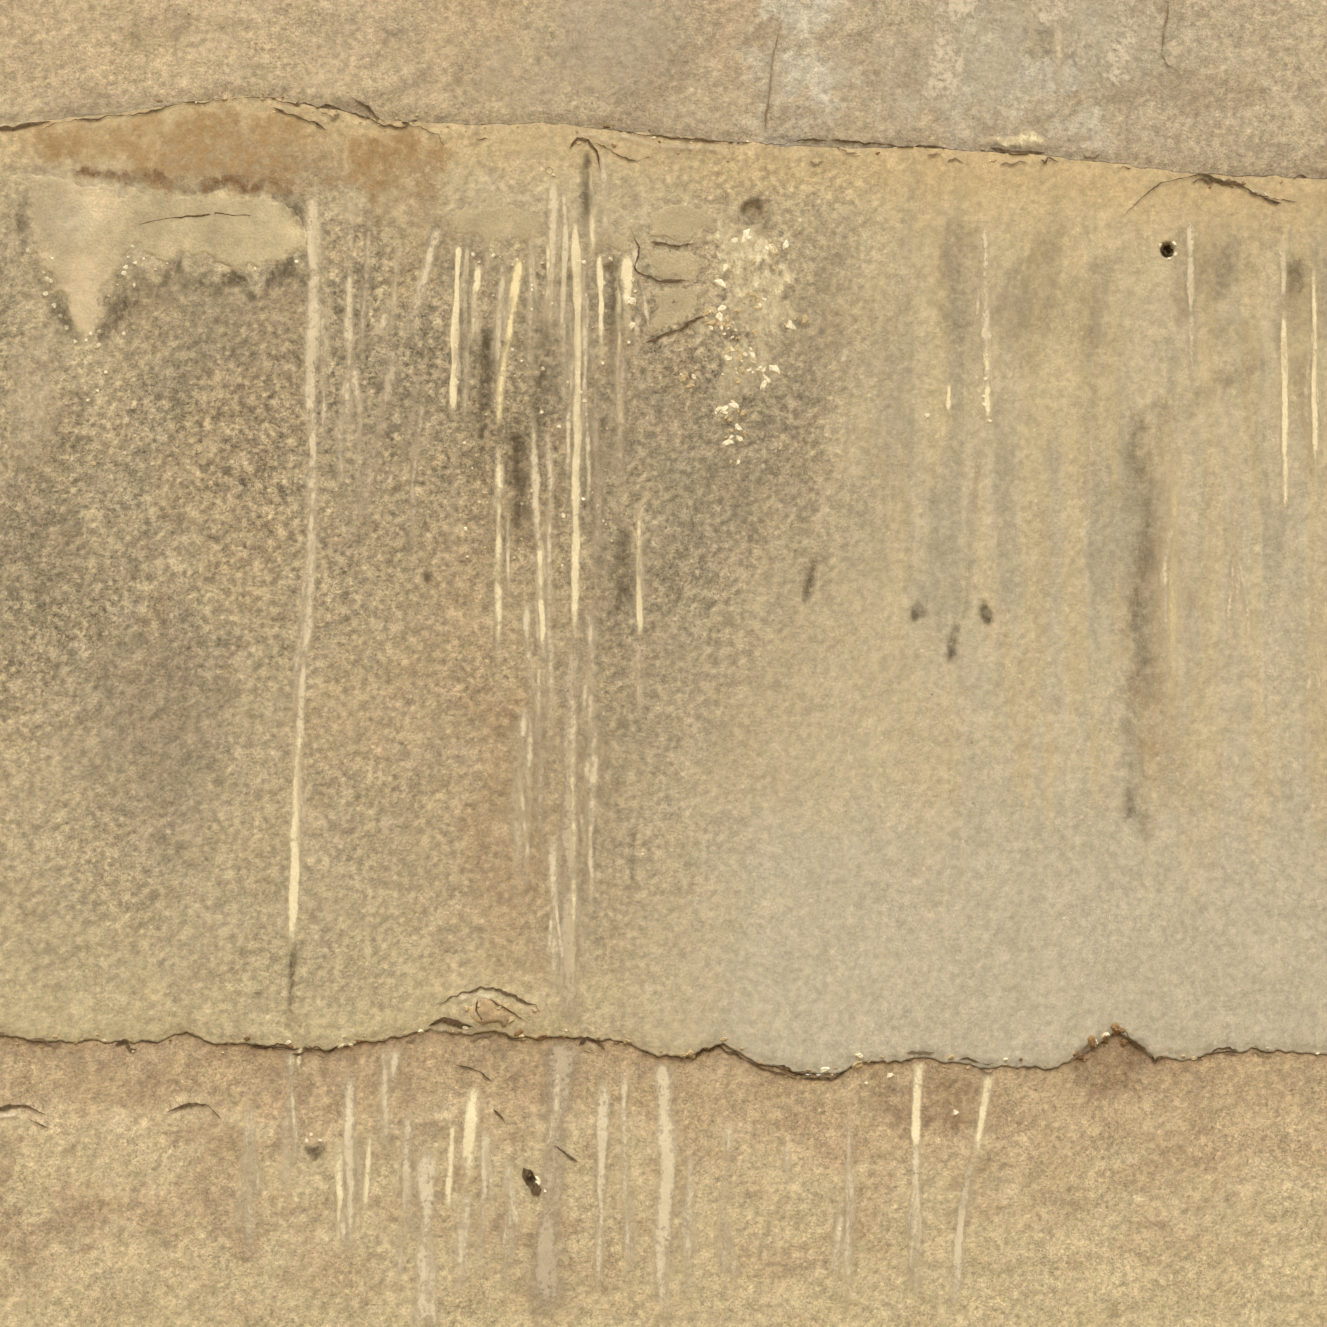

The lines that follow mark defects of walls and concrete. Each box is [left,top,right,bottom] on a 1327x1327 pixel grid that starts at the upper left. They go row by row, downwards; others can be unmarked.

rust [79,113,294,193]
crack [0,96,447,148]
crack [570,35,1044,172]
peeling [13,174,307,442]
peeling [579,197,809,465]
leakage [1274,273,1321,506]
leakage [288,154,649,1016]
crack [429,986,540,1124]
crack [690,1045,848,1080]
spalling [1069,1023,1272,1063]
leakage [334,1051,519,1325]
leakage [653,1064,698,1311]